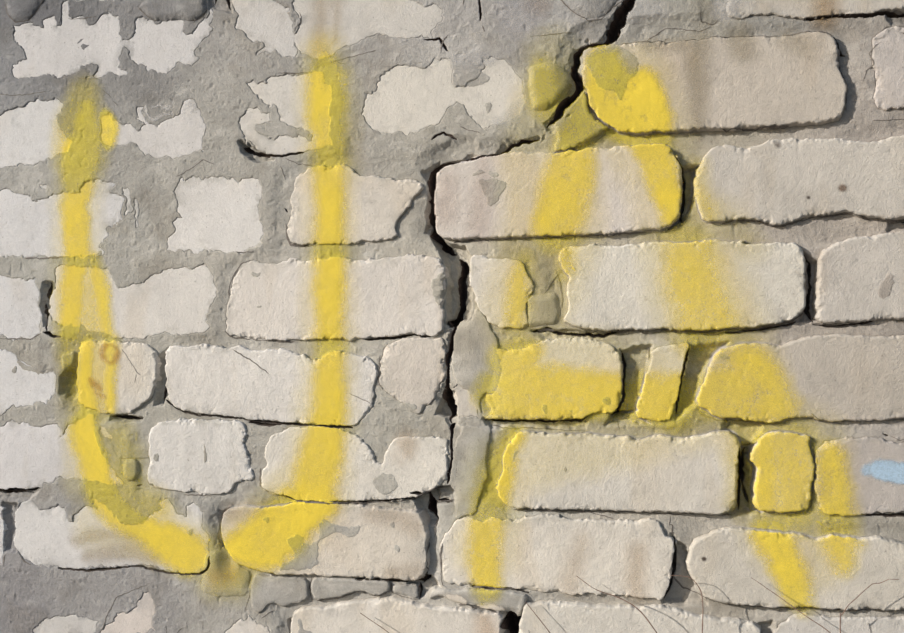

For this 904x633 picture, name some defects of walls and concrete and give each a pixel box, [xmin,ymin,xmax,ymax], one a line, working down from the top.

peeling [12,0,214,79]
crack [647,11,719,41]
peeling [111,99,206,159]
peeling [239,73,330,155]
peeling [362,57,526,136]
crack [309,0,636,601]
peeling [33,592,156,633]
peeling [225,614,270,633]
crack [500,611,521,633]